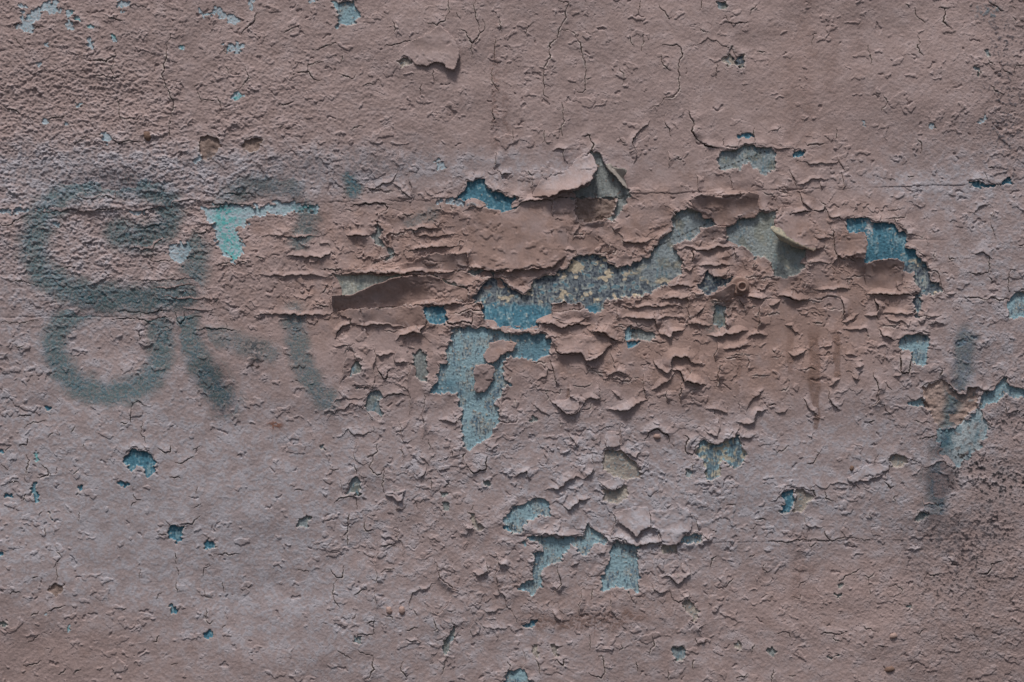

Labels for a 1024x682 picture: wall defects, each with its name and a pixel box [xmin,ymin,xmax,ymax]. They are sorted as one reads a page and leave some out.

crack [1,415,84,594]
crack [1,34,255,341]
peeling [117,446,157,488]
crack [121,401,251,628]
peeling [436,175,519,213]
peeling [331,191,826,451]
peeling [533,151,631,223]
peeling [503,431,702,596]
crack [217,0,1024,680]
peeling [717,133,776,176]
peeling [840,213,943,318]
spalling [908,376,1024,469]